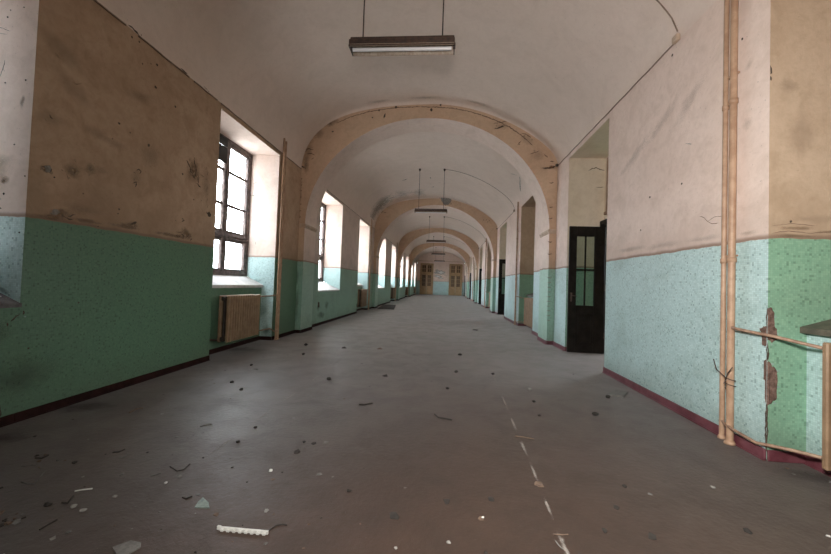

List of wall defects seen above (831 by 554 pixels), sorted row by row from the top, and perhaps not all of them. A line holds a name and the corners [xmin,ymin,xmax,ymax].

spalling [759,307,780,451]